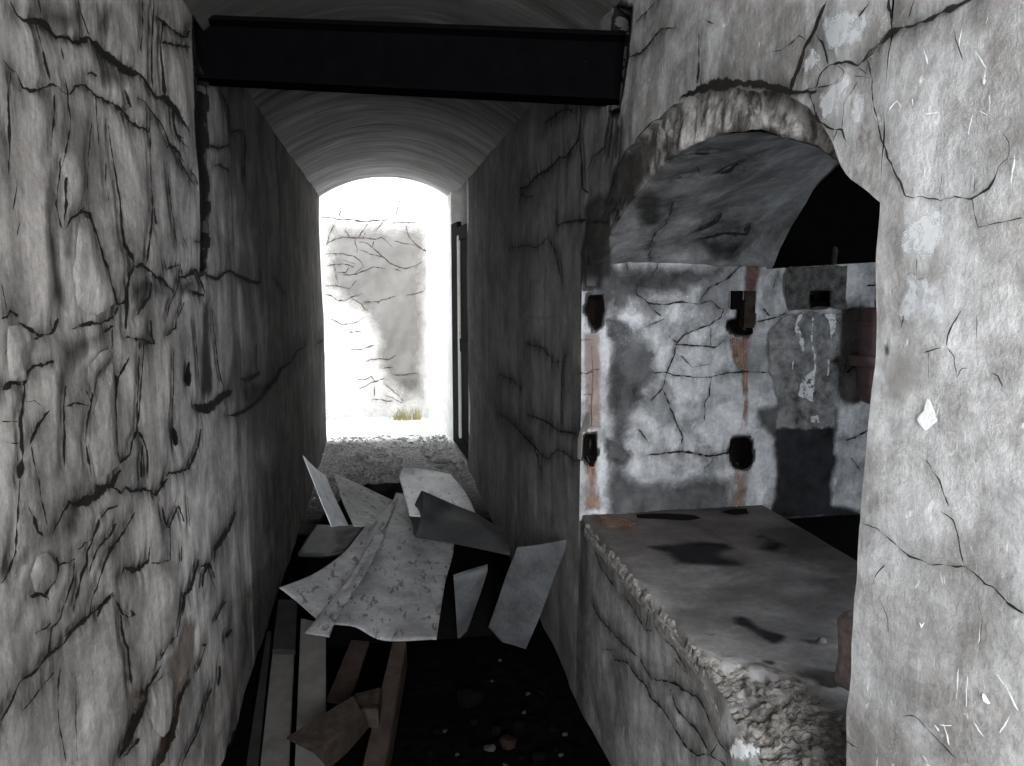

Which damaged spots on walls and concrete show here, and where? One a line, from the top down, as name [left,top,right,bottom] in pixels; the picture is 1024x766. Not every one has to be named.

crack [774,0,1021,228]
crack [625,152,766,469]
corrosion [745,266,759,291]
crack [1,0,426,766]
damp [606,439,630,464]
corrosion [732,338,748,415]
damp [759,407,779,436]
peeling [792,313,836,402]
damp [652,542,739,565]
crack [857,460,1023,650]
spalling [584,523,847,766]
damp [736,617,785,643]